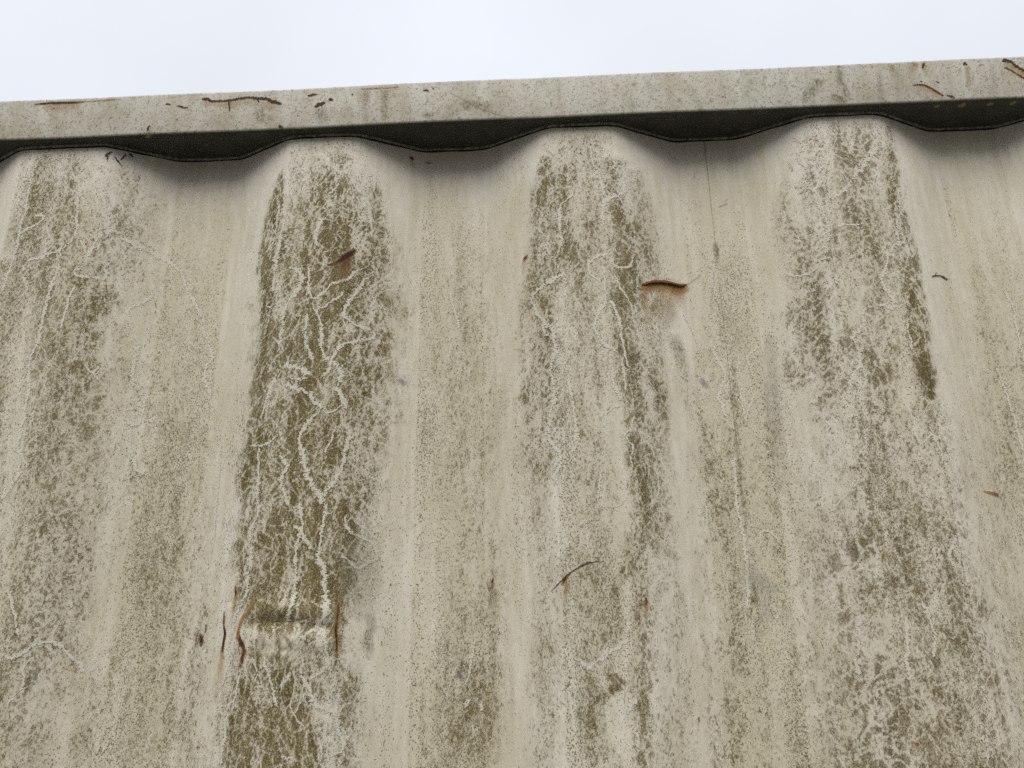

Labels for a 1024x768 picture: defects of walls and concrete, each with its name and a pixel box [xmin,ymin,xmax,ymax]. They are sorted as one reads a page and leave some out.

damp [0,138,413,768]
rust [221,601,254,668]
damp [502,123,1024,768]